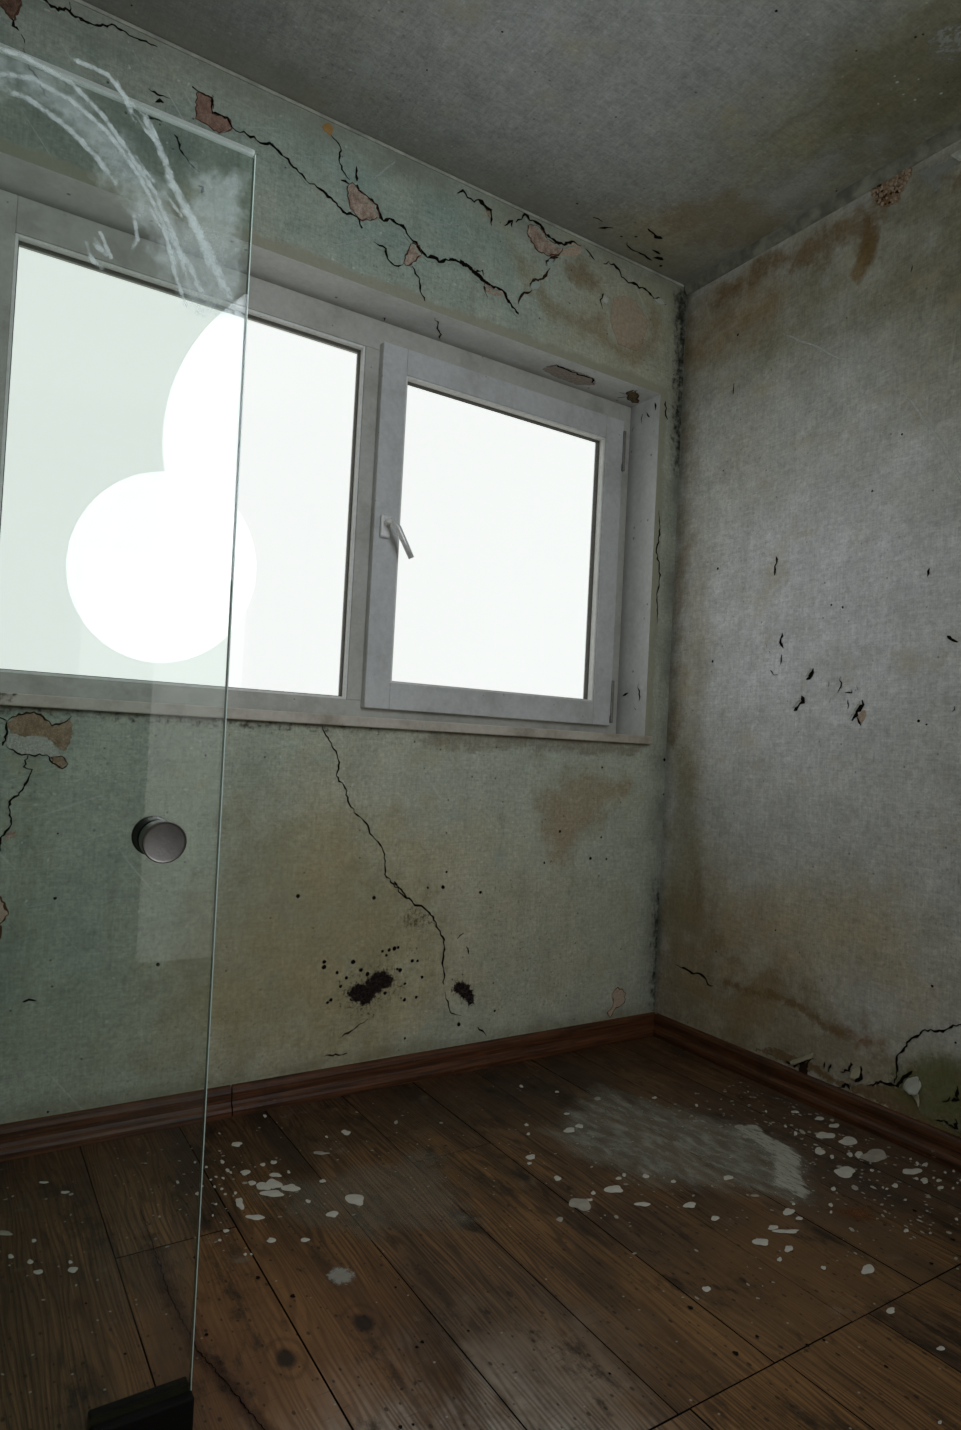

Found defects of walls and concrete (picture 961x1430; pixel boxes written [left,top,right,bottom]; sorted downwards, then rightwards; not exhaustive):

flaking render [0,0,47,97]
crack [40,0,157,47]
flaking render [192,86,233,134]
crack [232,127,666,316]
flaking render [871,168,912,207]
flaking render [2,711,74,769]
crack [0,756,33,854]
crack [322,726,487,1036]
water stain [321,946,423,1016]
water stain [451,981,475,1006]
crack [894,1024,961,1083]
peeling [756,1047,961,1138]